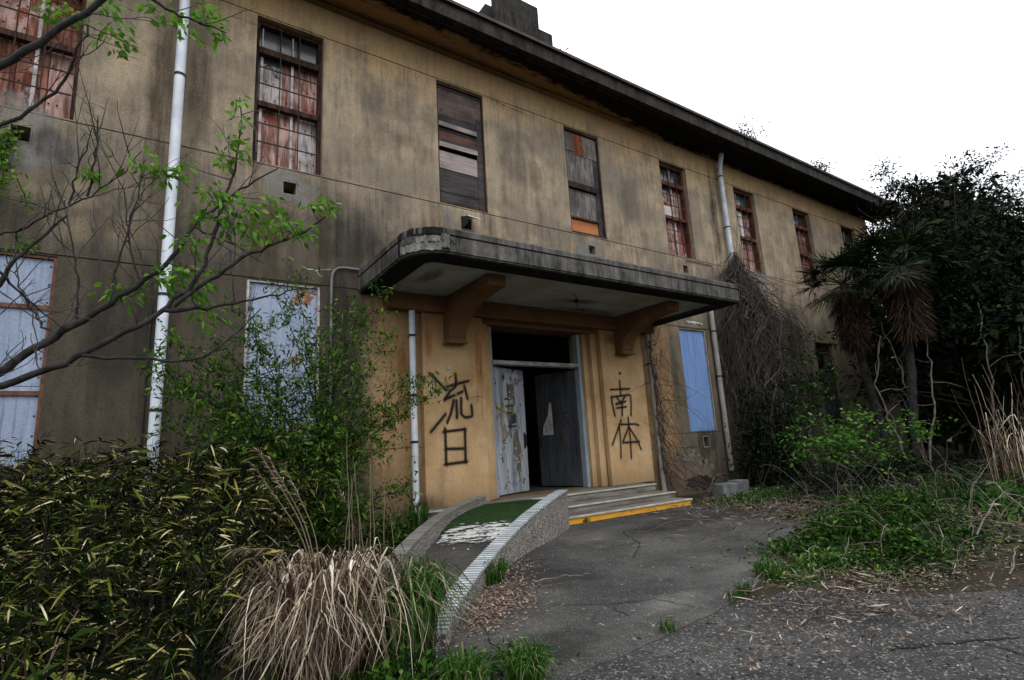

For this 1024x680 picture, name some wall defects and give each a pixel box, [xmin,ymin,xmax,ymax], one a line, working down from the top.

spalling [398,226,450,257]
peeling [512,423,524,475]